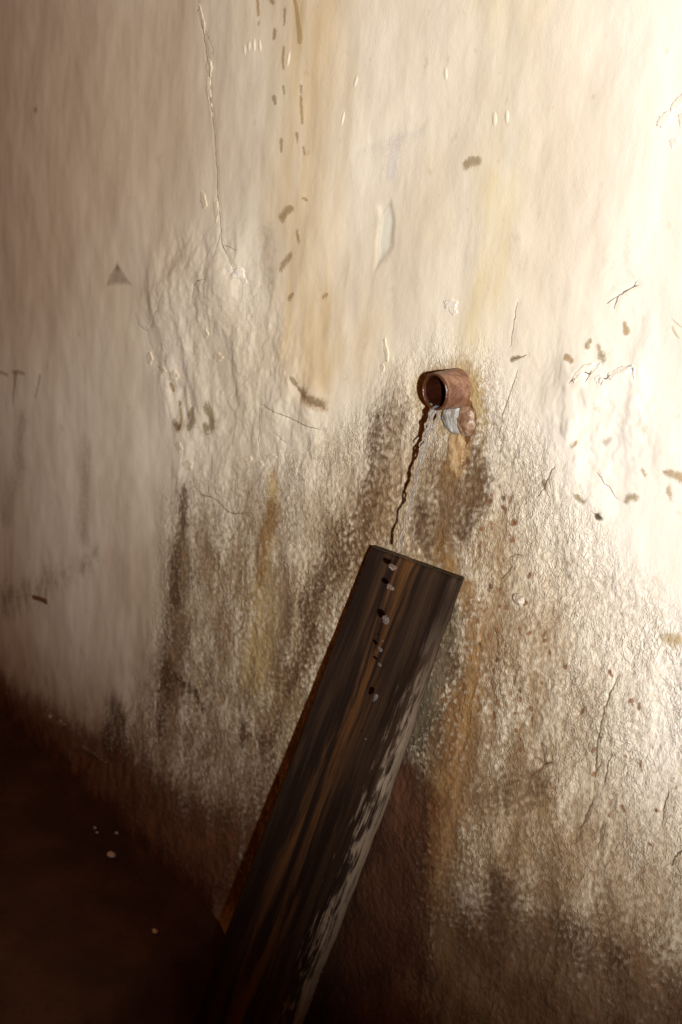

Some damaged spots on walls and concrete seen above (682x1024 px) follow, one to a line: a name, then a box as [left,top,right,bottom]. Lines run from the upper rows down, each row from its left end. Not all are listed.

crack [191,10,236,327]
damp [157,487,205,737]
damp [241,408,406,697]
damp [416,442,493,559]
corrosion [418,361,518,542]
damp [0,677,262,911]
damp [303,656,682,1024]
crack [579,678,618,847]